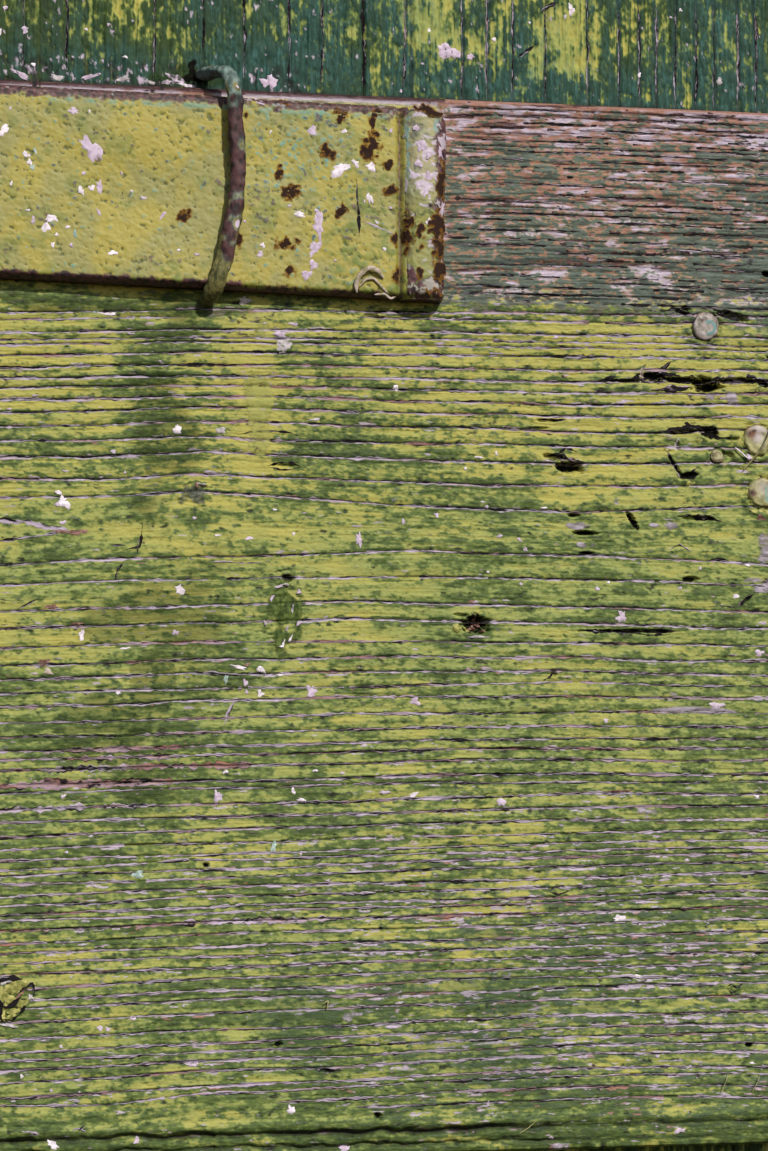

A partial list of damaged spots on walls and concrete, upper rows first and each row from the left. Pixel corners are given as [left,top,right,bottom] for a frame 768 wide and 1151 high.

corrosion [333,108,348,125]
corrosion [413,103,443,117]
corrosion [319,142,337,161]
corrosion [359,108,399,196]
corrosion [274,164,301,201]
corrosion [335,202,349,219]
corrosion [390,159,446,296]
corrosion [274,236,301,250]